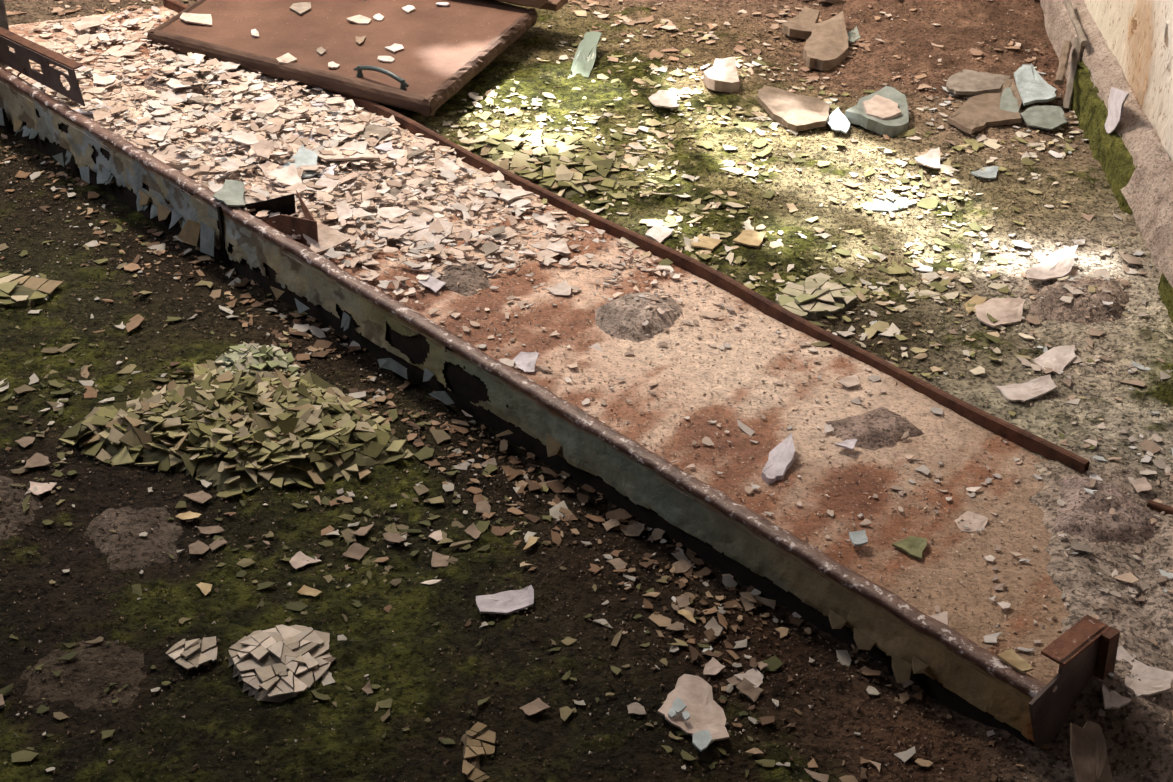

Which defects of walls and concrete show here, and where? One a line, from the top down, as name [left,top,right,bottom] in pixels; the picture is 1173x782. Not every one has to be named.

peeling [648,90,679,109]
peeling [1014,63,1057,106]
peeling [55,61,460,293]
peeling [482,225,571,262]
peeling [645,224,674,243]
peeling [690,230,766,251]
spalling [1120,145,1173,287]
peeling [963,295,1026,328]
peeling [513,352,539,372]
peeling [995,345,1076,402]
peeling [476,585,534,615]
peeling [658,674,730,751]